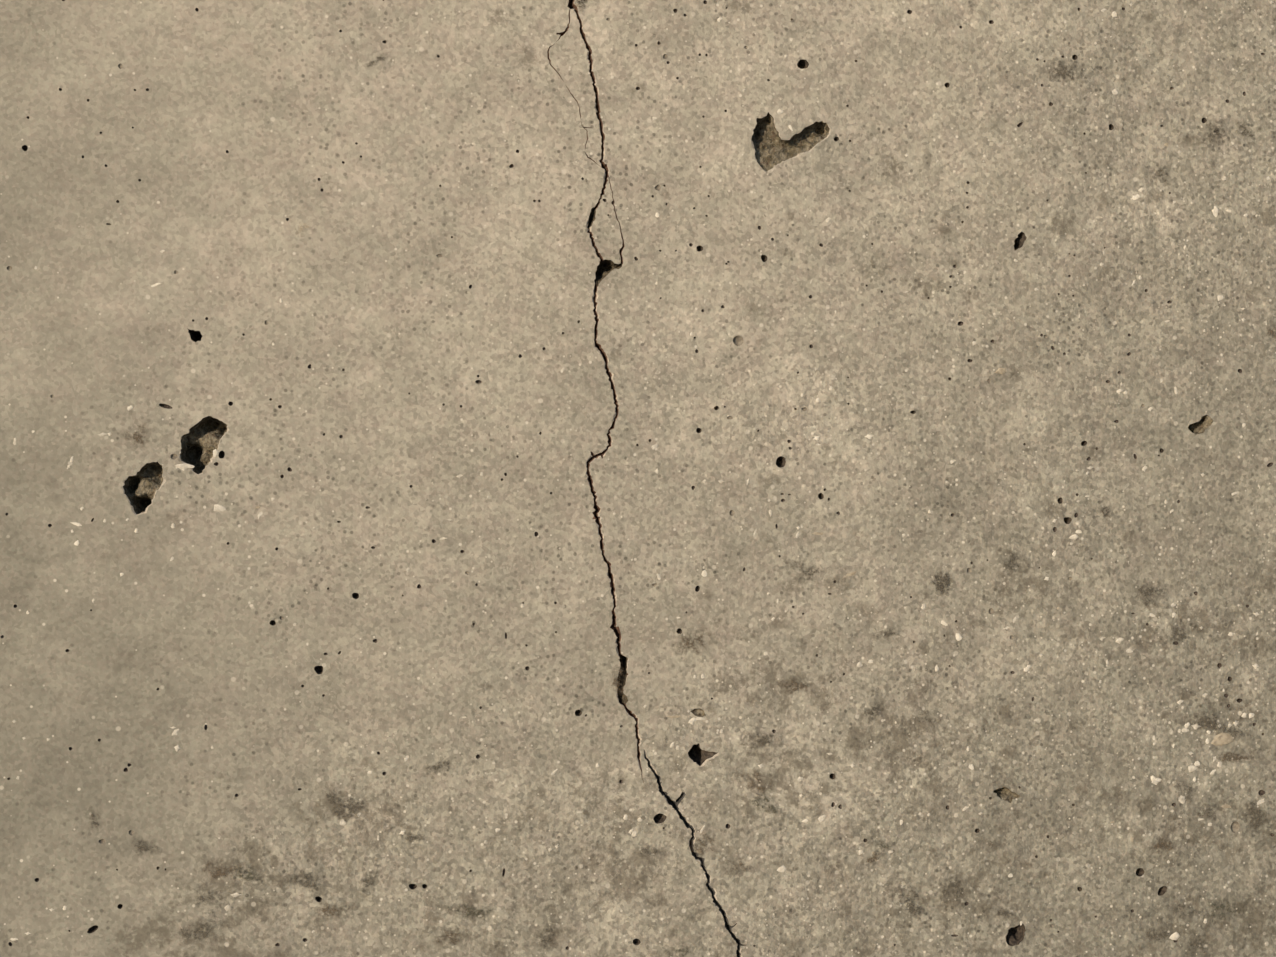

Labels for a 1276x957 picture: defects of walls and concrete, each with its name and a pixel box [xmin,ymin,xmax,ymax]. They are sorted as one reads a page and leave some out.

spalling [751,112,831,174]
spalling [179,416,229,475]
spalling [123,461,166,516]
crack [547,0,746,957]